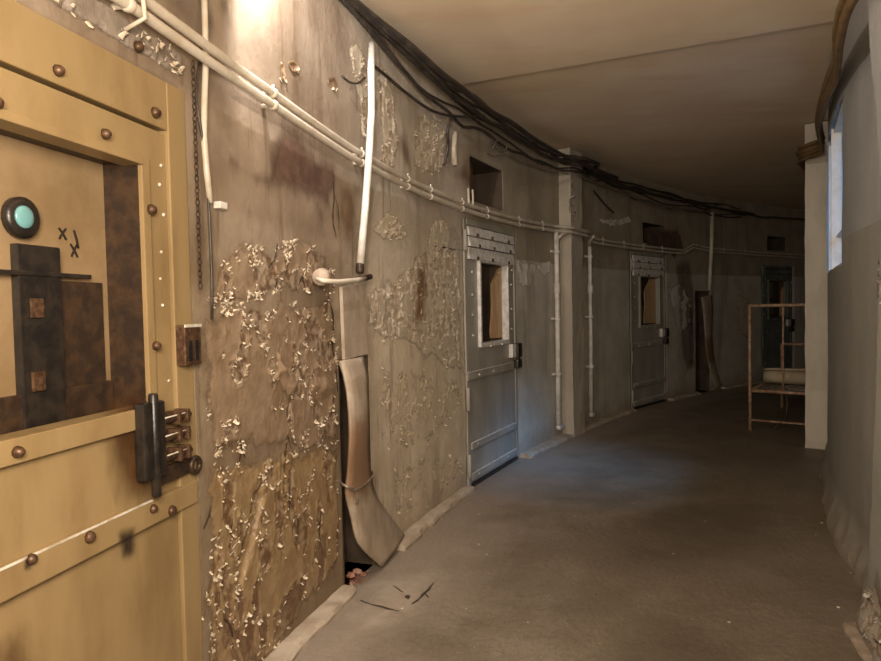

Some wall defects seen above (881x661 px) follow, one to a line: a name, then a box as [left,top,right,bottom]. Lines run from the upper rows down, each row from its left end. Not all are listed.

peeling [51,0,186,75]
peeling [349,44,399,171]
peeling [413,115,449,176]
peeling [368,219,466,374]
peeling [202,238,341,661]
peeling [856,587,881,661]